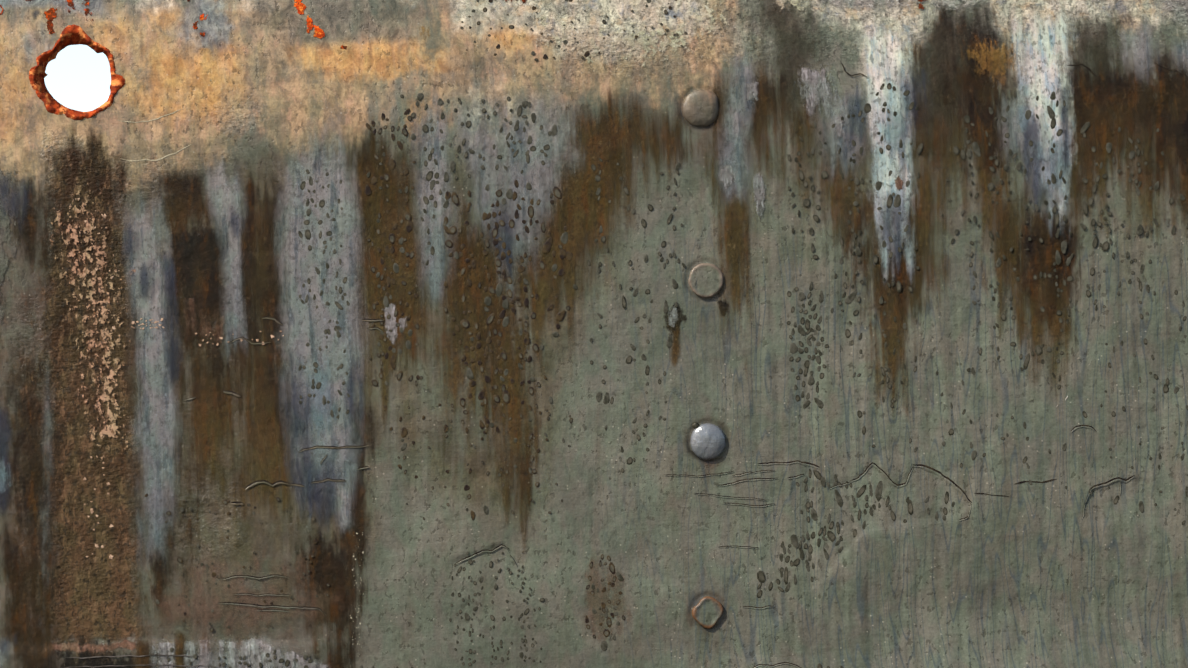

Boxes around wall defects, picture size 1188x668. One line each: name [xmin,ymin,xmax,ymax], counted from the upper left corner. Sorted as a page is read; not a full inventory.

rust [25,0,93,34]
rust [12,131,148,668]
rust [294,0,325,39]
leakage [0,94,683,668]
leakage [712,0,1188,405]